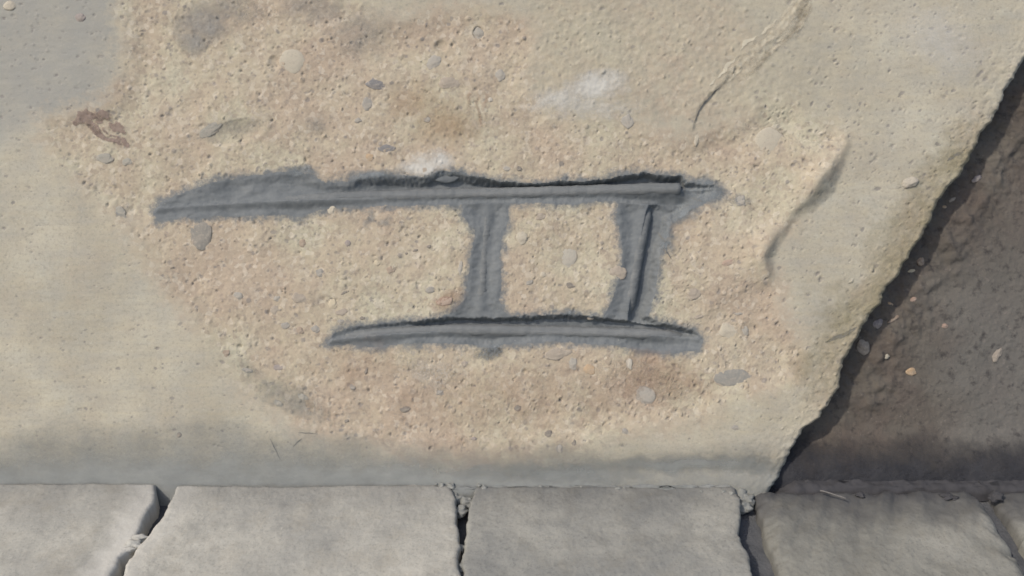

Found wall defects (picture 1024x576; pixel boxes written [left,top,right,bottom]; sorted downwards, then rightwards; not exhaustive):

spalling [44,0,838,456]
crack [687,0,810,141]